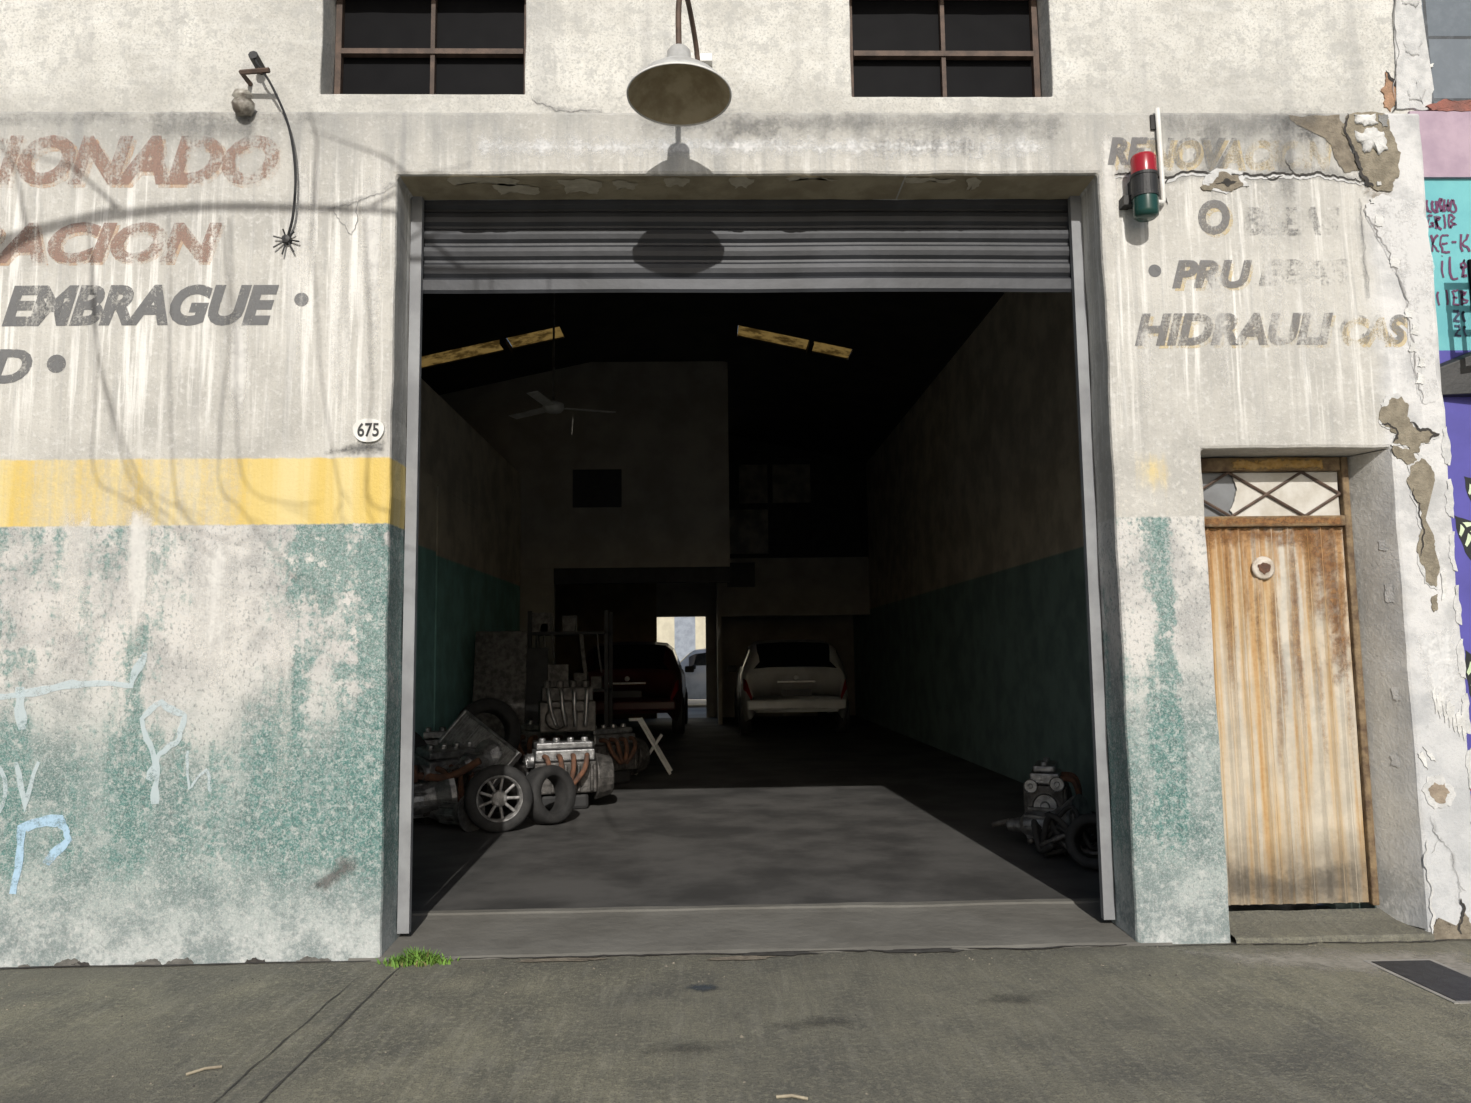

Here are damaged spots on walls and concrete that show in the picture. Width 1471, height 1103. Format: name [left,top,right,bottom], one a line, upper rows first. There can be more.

crack [1115,162,1370,296]
peeling [1287,0,1471,809]
corrosion [1204,517,1345,684]
spalling [1423,840,1471,939]
spalling [54,958,89,967]
spalling [134,957,194,965]